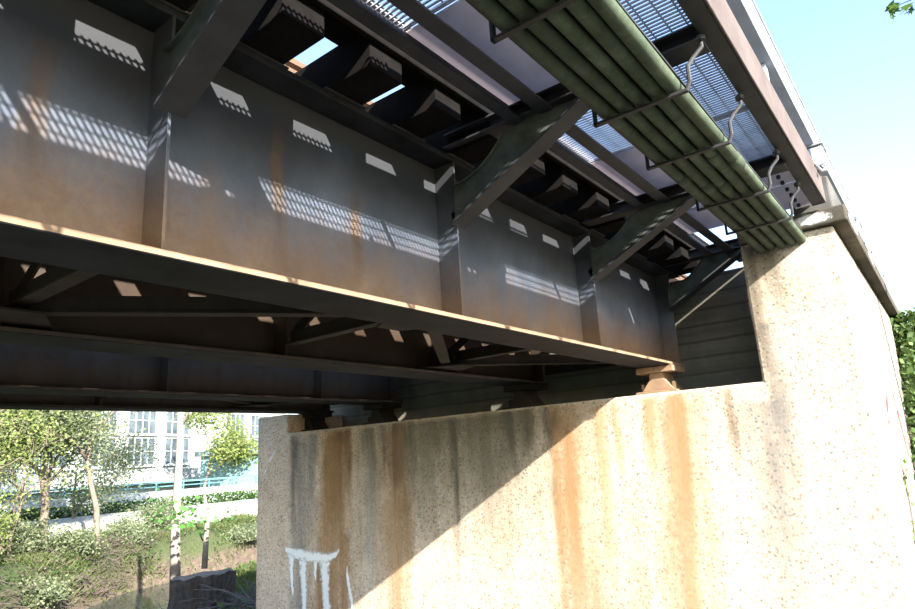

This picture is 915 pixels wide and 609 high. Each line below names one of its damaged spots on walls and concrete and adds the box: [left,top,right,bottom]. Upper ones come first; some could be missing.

corrosion [318,547,346,609]